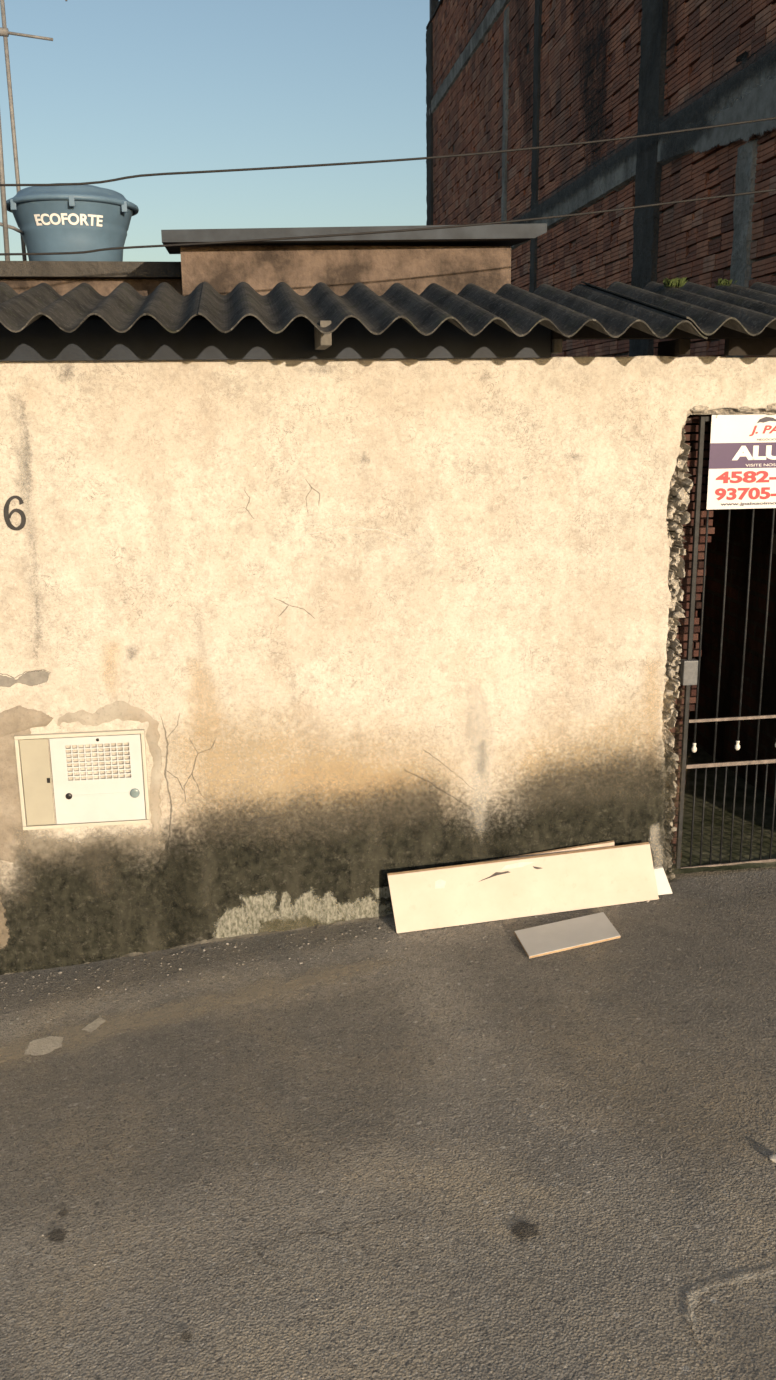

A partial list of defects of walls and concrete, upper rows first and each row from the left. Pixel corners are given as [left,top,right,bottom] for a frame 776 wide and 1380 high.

leakage [0,723,675,975]
peeling [0,895,10,949]
peeling [213,886,393,938]